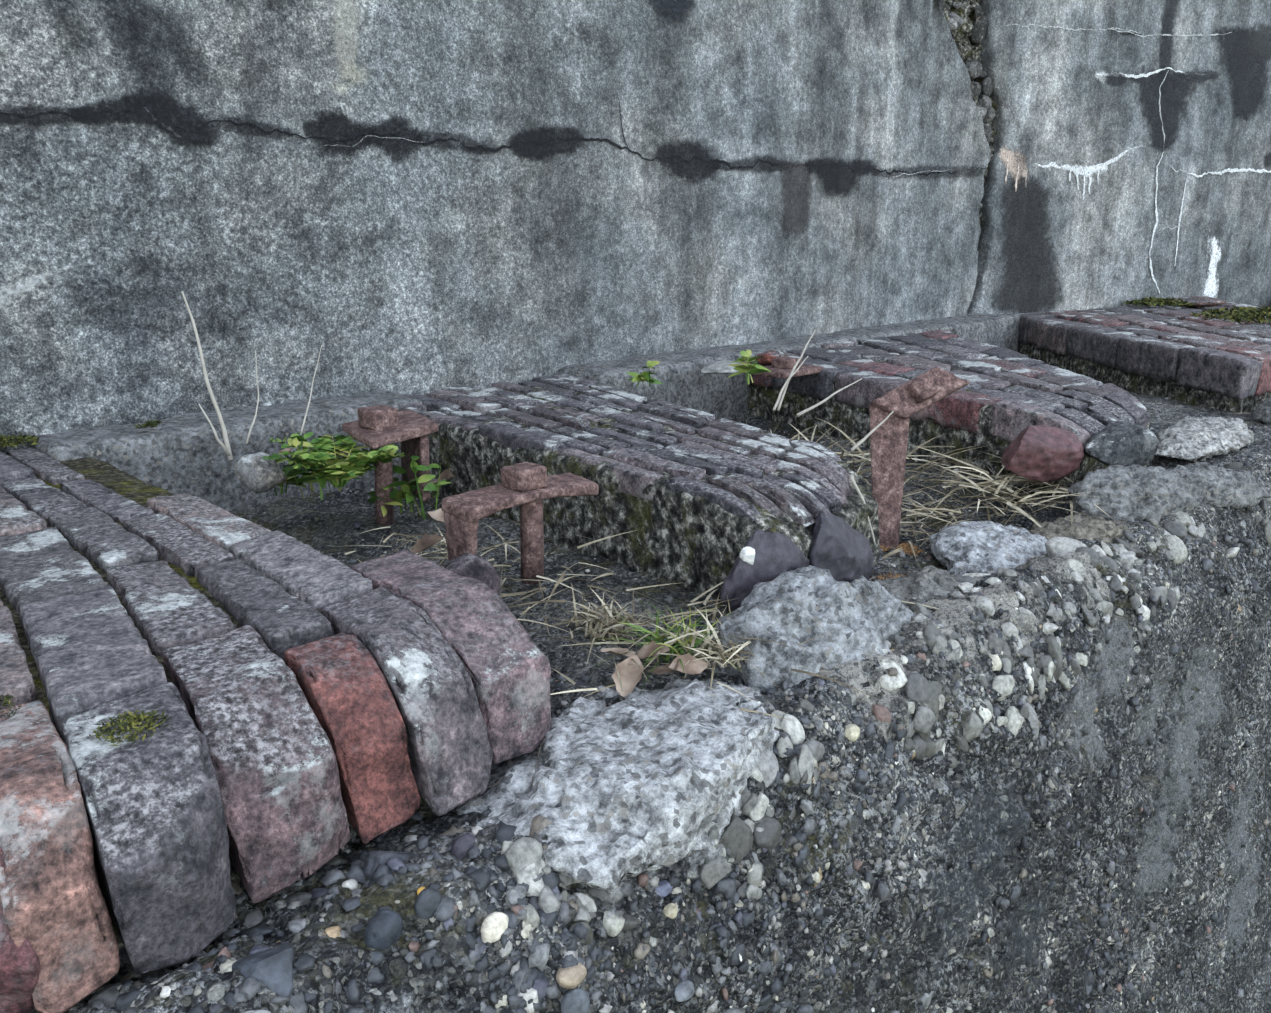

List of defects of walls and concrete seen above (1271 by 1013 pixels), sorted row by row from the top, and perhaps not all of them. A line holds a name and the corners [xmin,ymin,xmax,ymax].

damp [0,0,495,160]
crack [284,98,728,164]
damp [509,126,583,160]
damp [650,0,695,22]
damp [656,141,982,235]
damp [992,158,1064,313]
crack [876,0,1232,271]
crack [1035,67,1271,293]
damp [1105,0,1271,151]
efflorescence [1203,237,1221,298]